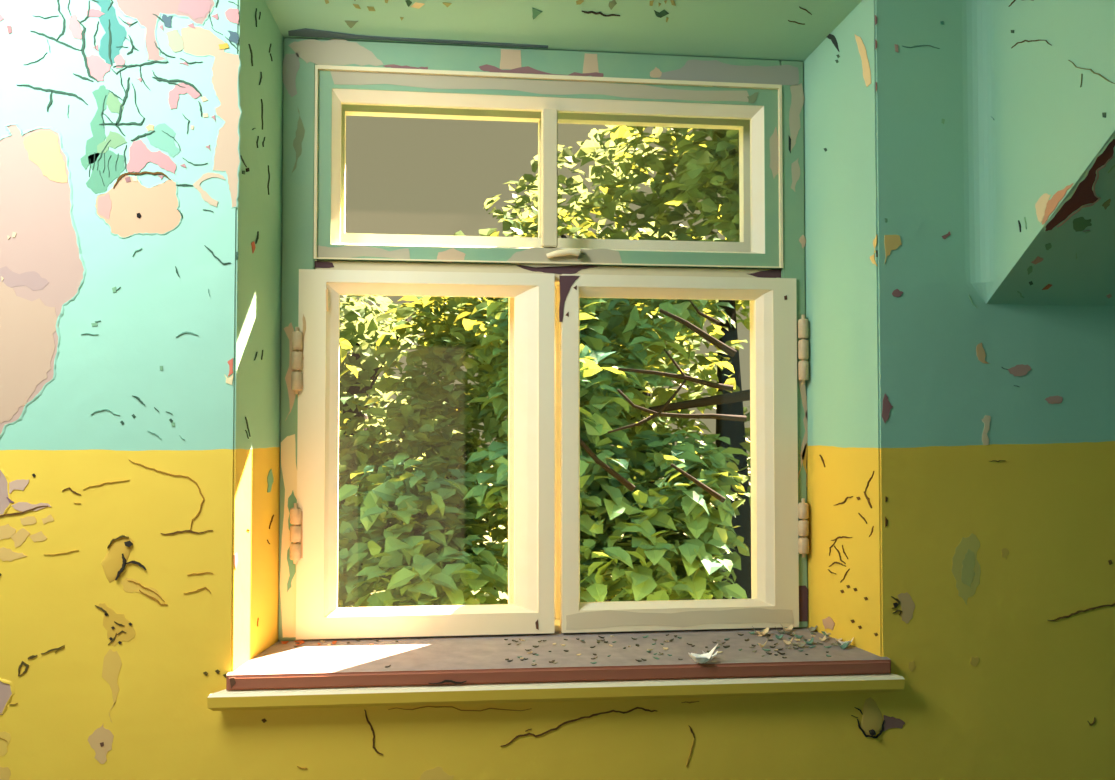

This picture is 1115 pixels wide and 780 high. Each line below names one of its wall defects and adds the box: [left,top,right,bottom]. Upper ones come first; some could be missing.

crack [16,0,213,217]
crack [209,0,273,195]
peeling [282,0,804,191]
flaking render [854,34,877,91]
flaking render [0,123,87,440]
flaking render [93,124,186,239]
crack [204,231,259,265]
flaking render [1027,137,1115,290]
flaking render [0,462,54,576]
crack [0,460,213,535]
crack [828,471,874,582]
crack [365,680,699,767]